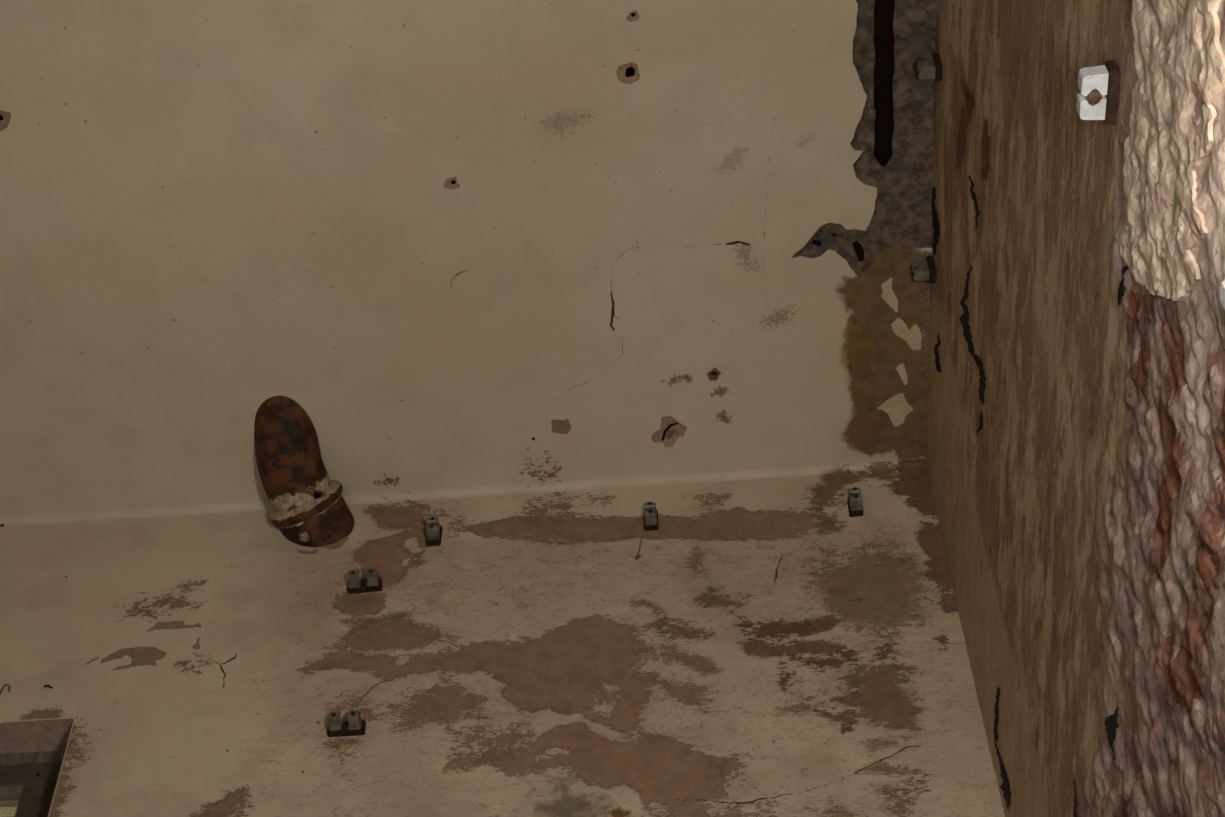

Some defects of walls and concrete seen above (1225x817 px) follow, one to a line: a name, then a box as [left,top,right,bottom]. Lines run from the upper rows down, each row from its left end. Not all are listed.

spalling [791,0,938,275]
peeling [1116,0,1225,301]
crack [610,245,688,359]
leakage [793,239,954,817]
peeling [888,459,958,613]
peeling [86,580,212,677]
peeling [296,448,819,817]
peeling [733,615,898,694]
peeling [812,689,867,733]
peeling [188,784,255,817]